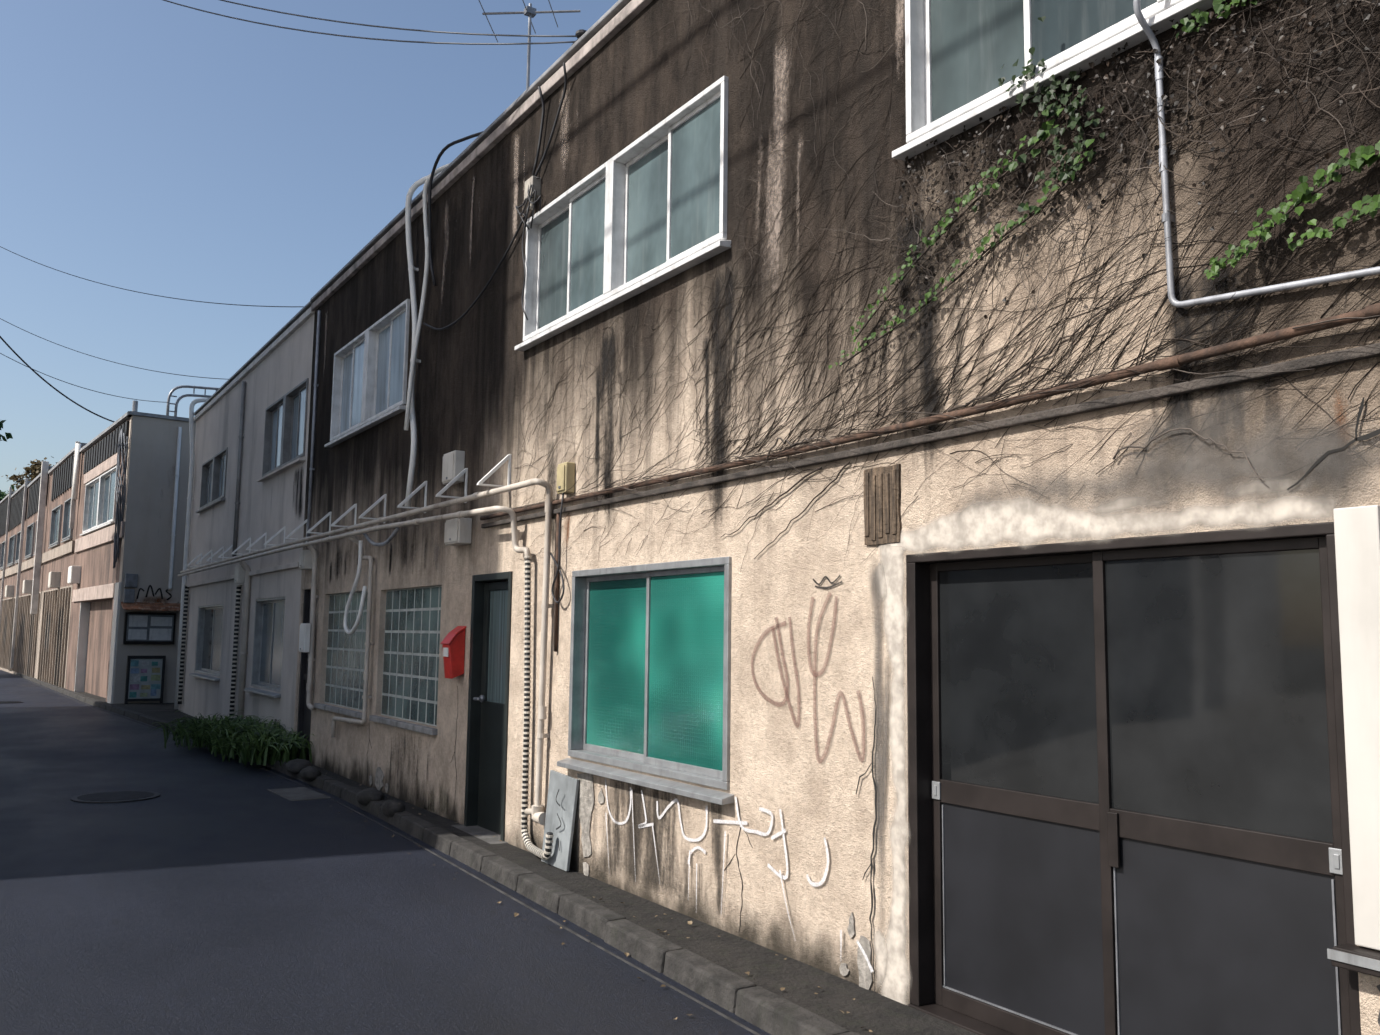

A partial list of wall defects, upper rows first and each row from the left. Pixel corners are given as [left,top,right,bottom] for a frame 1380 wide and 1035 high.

damp [768,56,786,262]
damp [595,329,622,513]
damp [703,271,740,512]
damp [884,208,962,456]
crack [856,677,877,993]